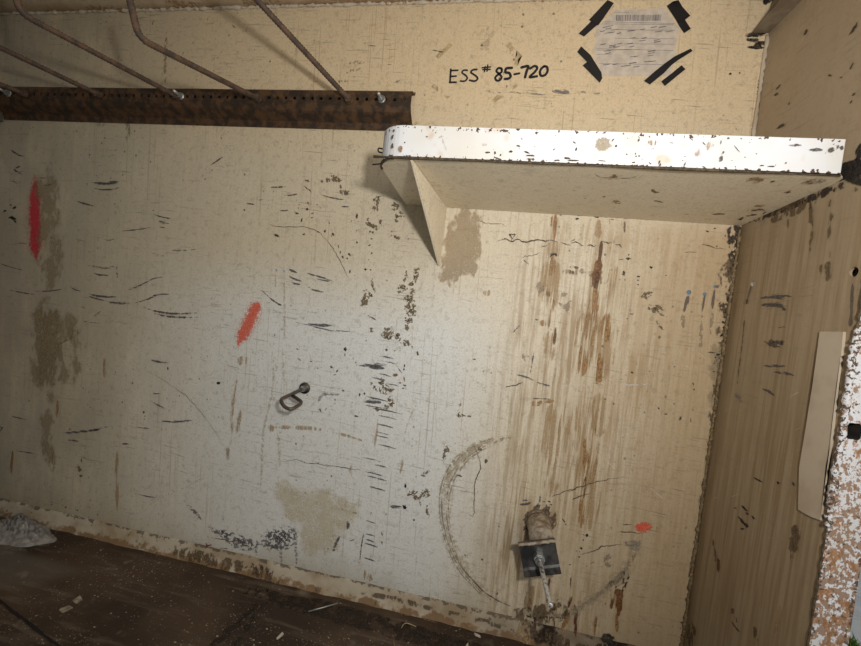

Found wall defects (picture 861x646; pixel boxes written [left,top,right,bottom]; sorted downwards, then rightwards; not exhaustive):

corrosion [540,214,560,356]
corrosion [578,217,626,383]
corrosion [532,394,605,529]
leakage [187,505,298,563]
leakage [439,439,507,605]
crack [0,599,60,646]
leakage [211,589,480,646]
corrosion [475,586,578,645]
leakage [524,626,622,646]
corrosion [610,575,630,632]
corrosion [806,527,828,646]